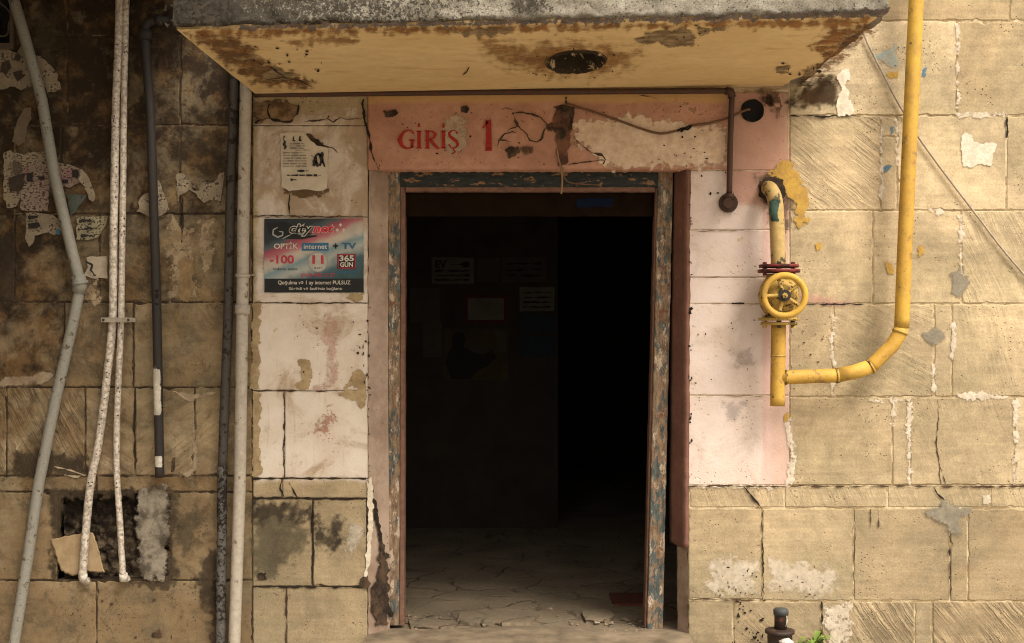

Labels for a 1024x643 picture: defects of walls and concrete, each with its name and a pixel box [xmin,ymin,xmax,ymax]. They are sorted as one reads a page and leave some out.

peeling [449,26,512,39]
peeling [634,25,728,48]
spalling [532,47,615,78]
peeling [776,63,821,78]
crack [299,99,380,170]
crack [497,108,553,147]
flaking render [961,132,997,168]
hole [758,176,786,203]
peeling [295,359,312,391]
damp [251,496,342,578]
spalling [359,541,391,625]